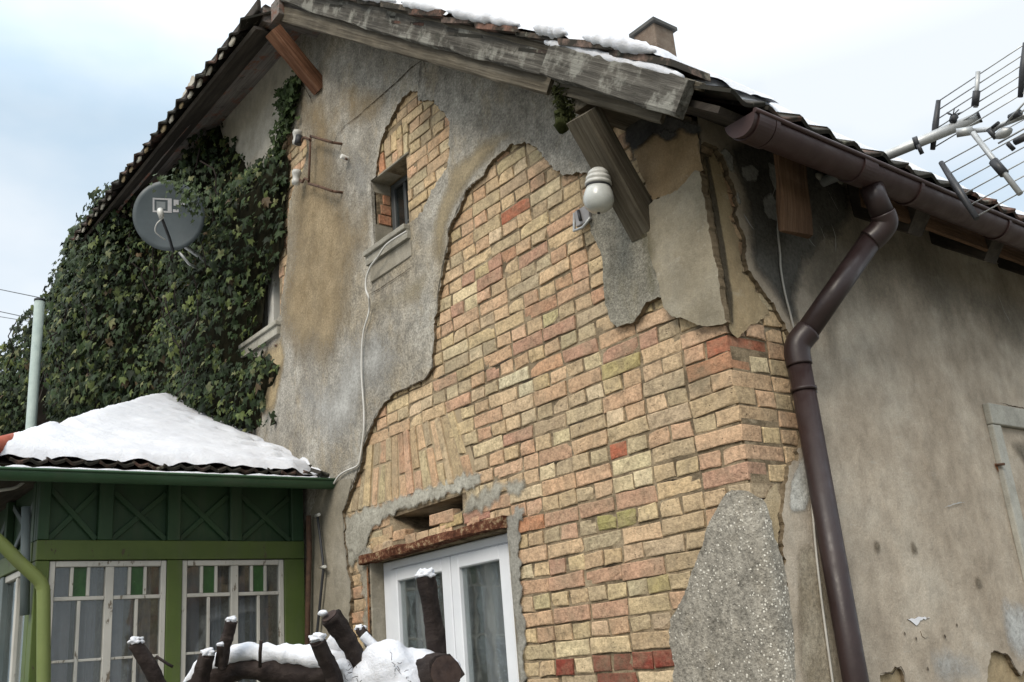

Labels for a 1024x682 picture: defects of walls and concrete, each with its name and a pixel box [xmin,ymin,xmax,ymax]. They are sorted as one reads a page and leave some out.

flaking render [375,90,450,220]
water stain [732,143,863,319]
water stain [860,244,1024,334]
flaking render [343,113,801,682]
flaking render [880,666,905,682]
flaking render [987,650,1024,682]